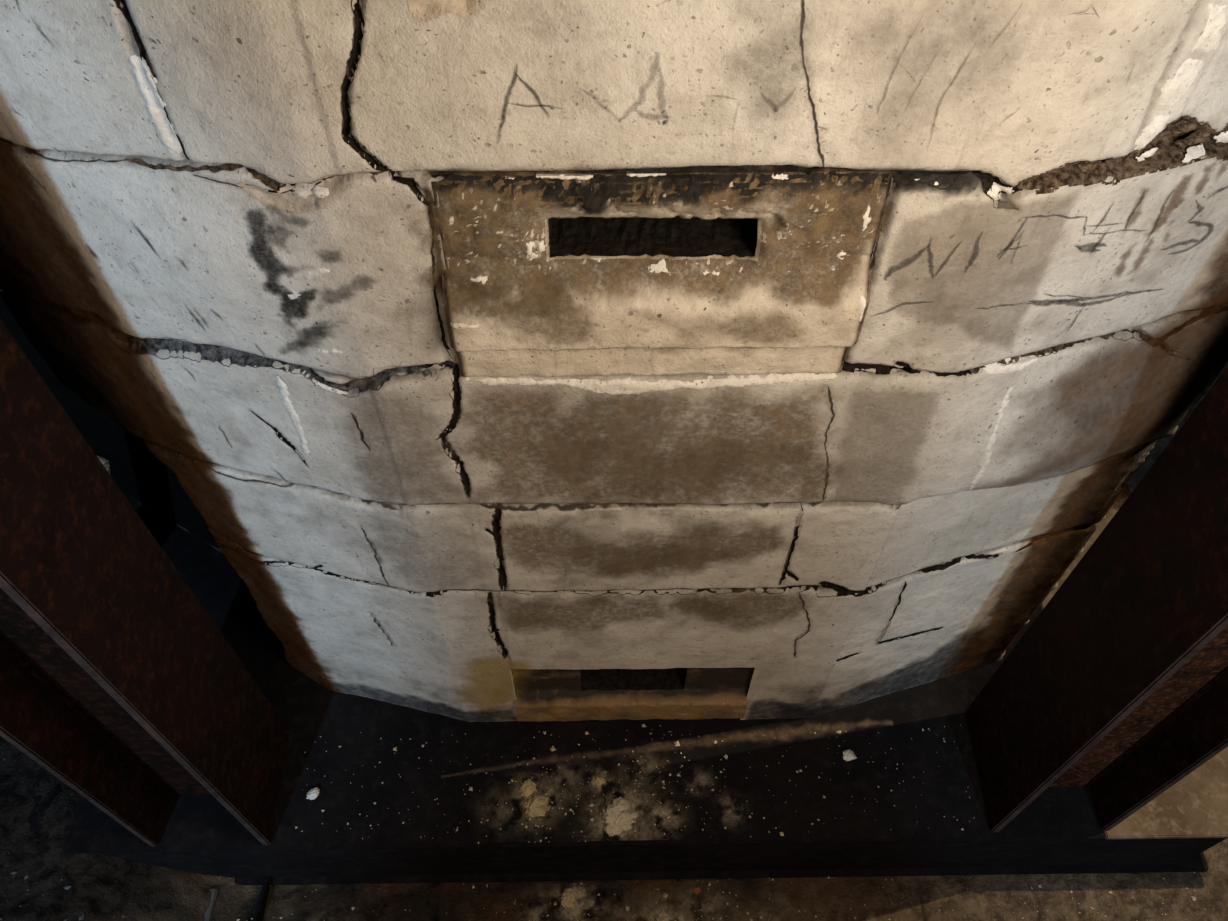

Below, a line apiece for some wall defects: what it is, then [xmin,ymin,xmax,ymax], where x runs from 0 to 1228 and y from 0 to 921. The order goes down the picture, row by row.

crack [114,0,189,160]
crack [800,0,827,167]
spalling [987,3,1228,201]
peeling [536,170,593,183]
leakage [427,169,890,342]
crack [342,0,508,659]
crack [251,411,308,467]
leakage [472,395,832,504]
crack [260,527,418,594]
leakage [507,526,779,575]
crack [837,542,1032,662]